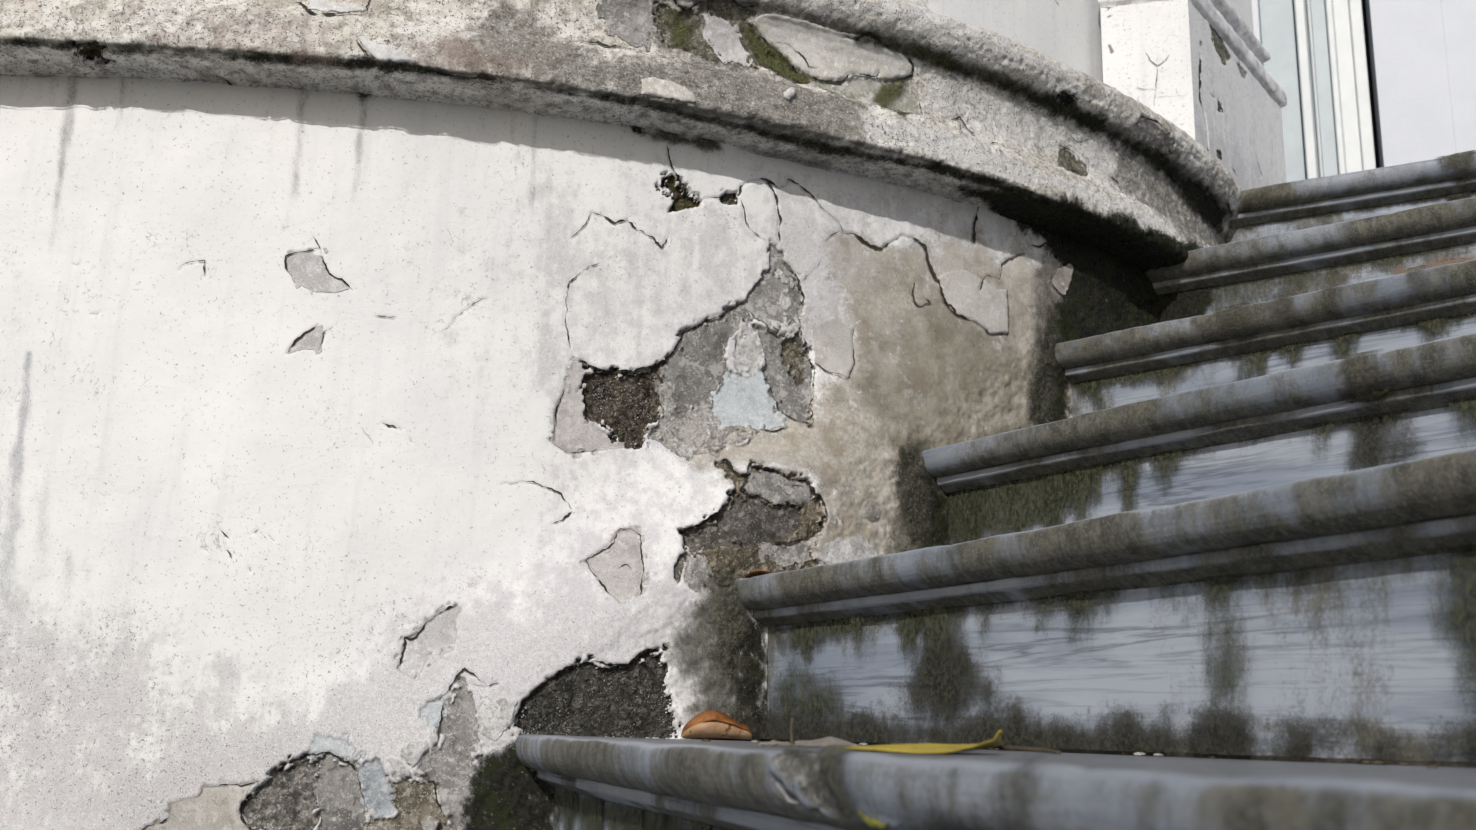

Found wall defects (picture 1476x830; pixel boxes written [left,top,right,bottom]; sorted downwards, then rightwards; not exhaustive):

flaking render [596,0,935,122]
flaking render [655,144,738,212]
peeling [286,325,331,354]
peeling [284,238,352,296]
peeling [937,269,1009,336]
damp [1342,350,1392,404]
flaking render [549,244,855,592]
peeling [580,527,649,604]
peeling [395,602,460,681]
flaking render [142,644,681,830]
damp [461,739,570,830]